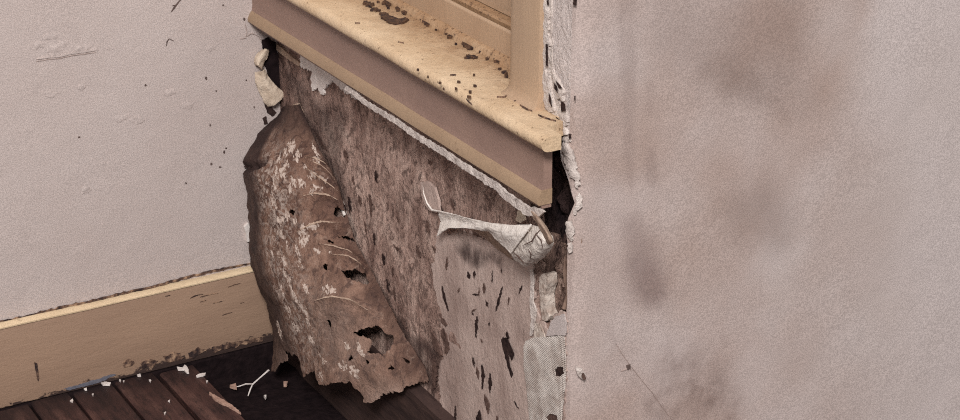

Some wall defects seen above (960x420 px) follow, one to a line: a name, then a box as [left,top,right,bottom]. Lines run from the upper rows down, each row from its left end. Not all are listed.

peeling [246,49,284,125]
peeling [344,0,586,420]
peeling [122,337,263,378]